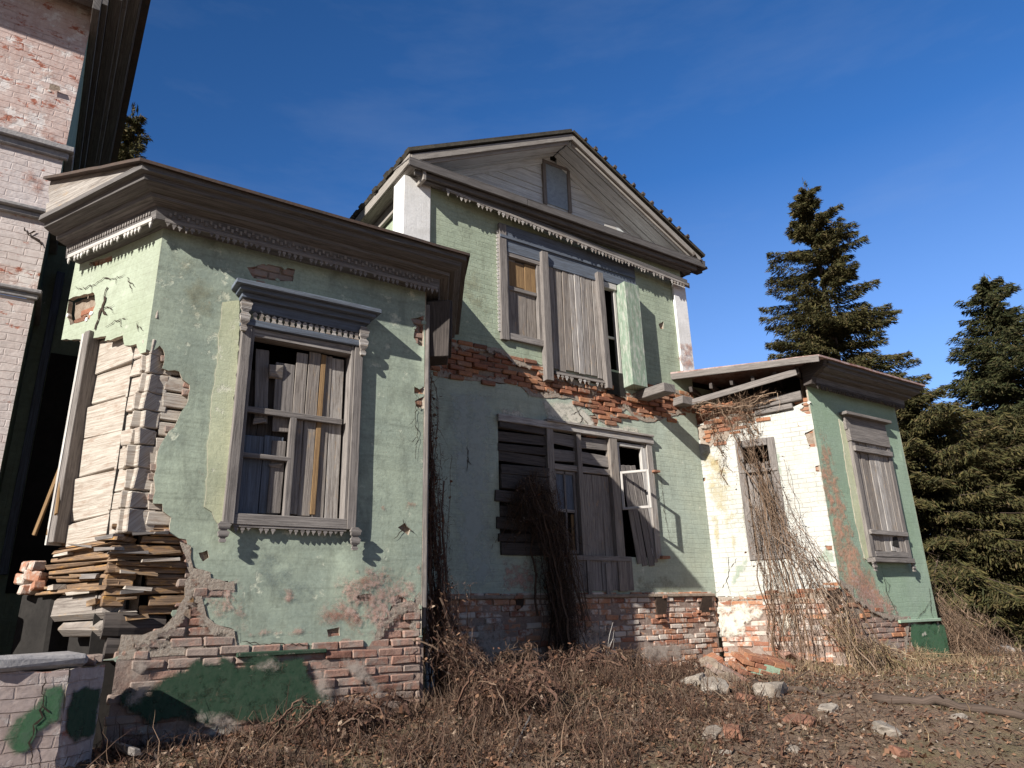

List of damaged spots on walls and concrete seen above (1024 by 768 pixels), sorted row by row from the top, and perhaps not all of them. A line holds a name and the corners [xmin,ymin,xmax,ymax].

spalling [66,297,96,323]
crack [76,276,142,330]
spalling [248,262,295,283]
peeling [543,401,638,432]
spalling [698,411,771,447]
damp [821,445,888,608]
spalling [69,529,242,668]
spalling [324,570,422,651]
spalling [696,580,914,661]
crack [28,677,50,767]